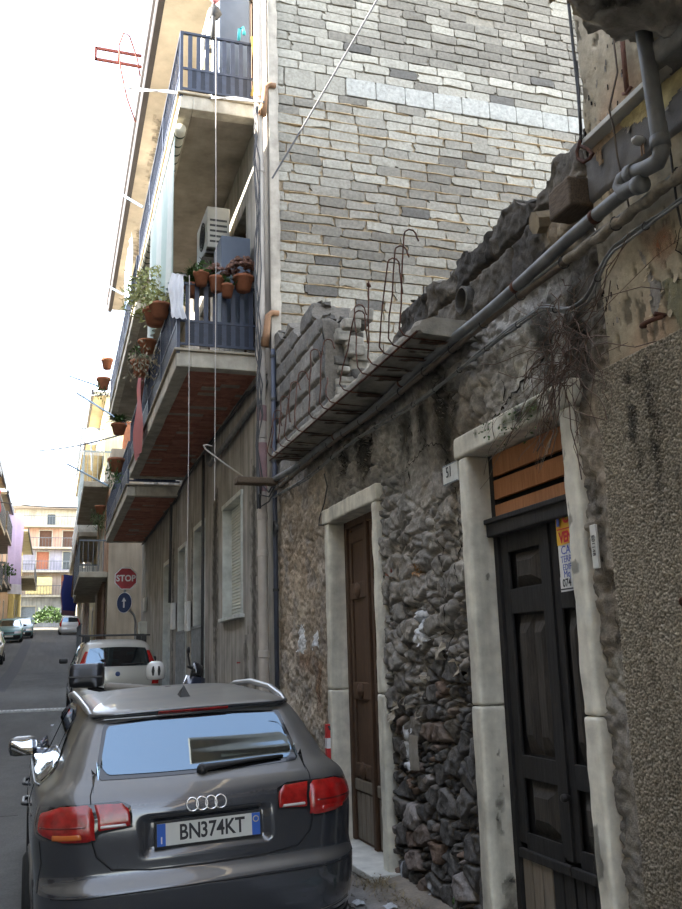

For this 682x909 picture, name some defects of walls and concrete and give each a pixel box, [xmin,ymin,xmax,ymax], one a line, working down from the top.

peeling [638,249,682,328]
spalling [333,307,374,395]
crack [491,321,567,436]
water stain [627,404,636,447]
peeling [296,624,319,654]
peeling [413,606,461,677]